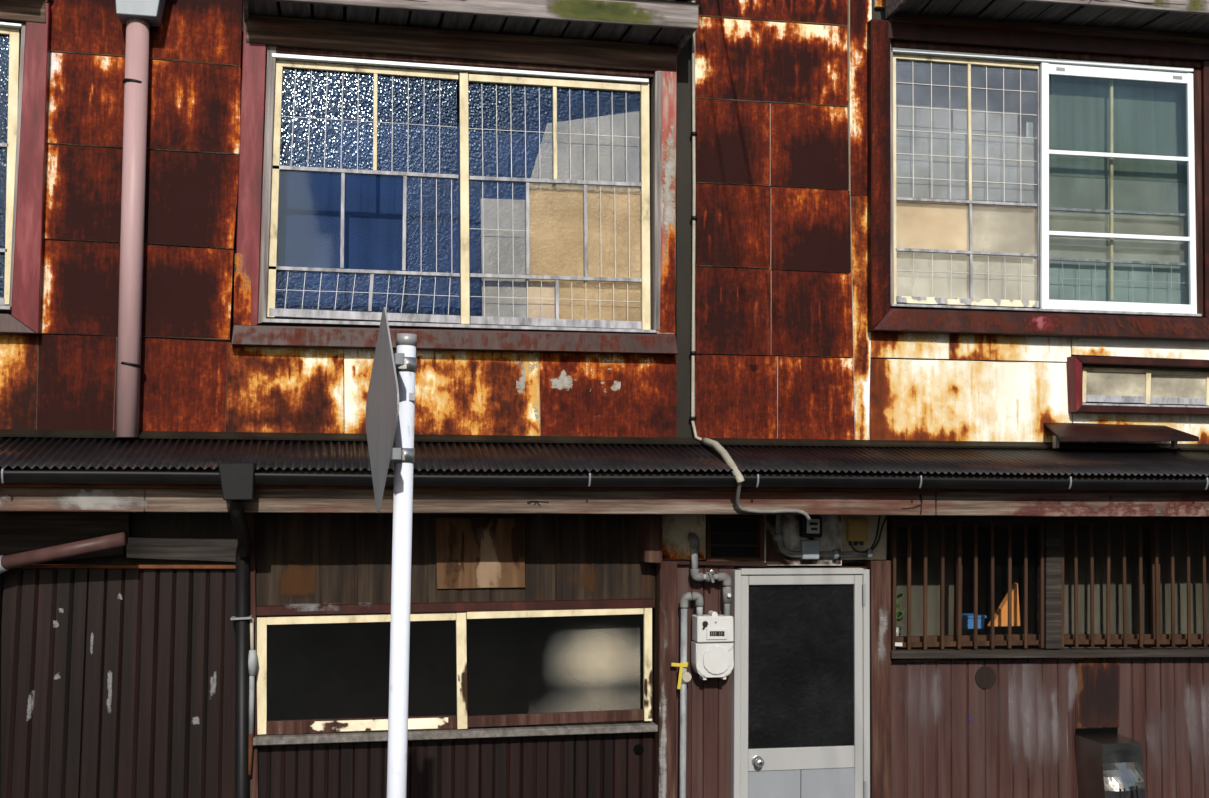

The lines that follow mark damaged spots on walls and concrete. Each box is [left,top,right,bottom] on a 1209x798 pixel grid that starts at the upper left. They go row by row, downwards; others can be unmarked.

corrosion [0,0,126,430]
corrosion [139,0,677,437]
corrosion [695,0,1209,444]
peeling [516,352,538,394]
peeling [550,370,576,391]
peeling [590,354,621,392]
corrosion [662,544,704,559]
peeling [311,719,388,731]
peeling [408,717,448,729]